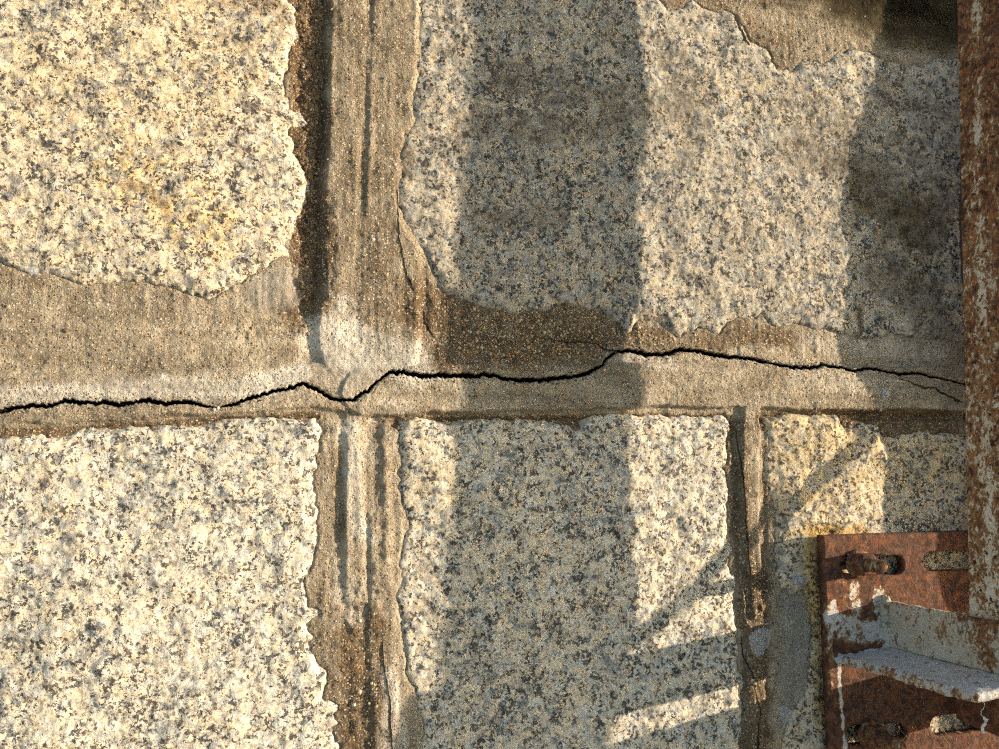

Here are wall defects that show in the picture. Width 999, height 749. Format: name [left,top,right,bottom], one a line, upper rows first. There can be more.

damp [829,0,958,44]
crack [0,336,965,417]